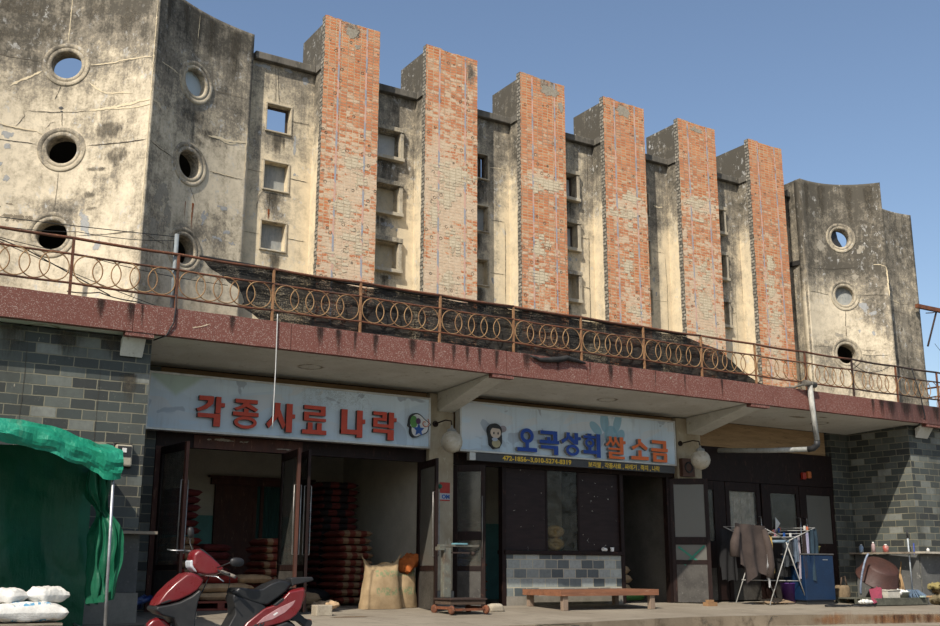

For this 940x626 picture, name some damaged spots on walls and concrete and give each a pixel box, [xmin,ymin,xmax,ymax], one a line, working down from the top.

crack [0,6,177,246]
water stain [98,122,122,136]
water stain [88,148,127,171]
crack [192,126,270,234]
peeling [0,203,33,222]